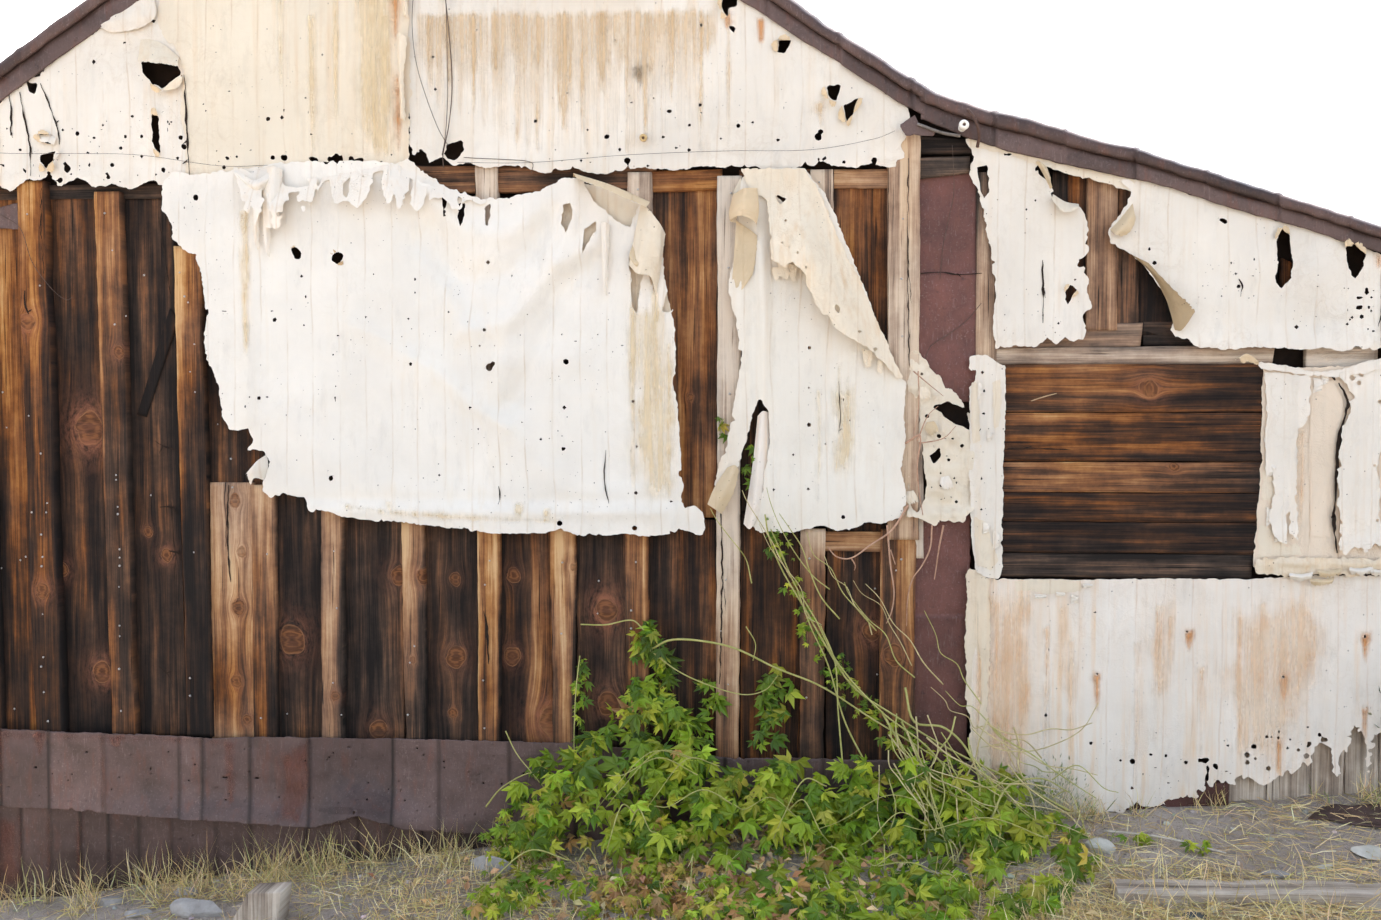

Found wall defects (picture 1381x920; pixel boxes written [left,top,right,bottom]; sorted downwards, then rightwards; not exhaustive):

peeling [150,75,182,116]
peeling [1345,239,1367,254]
peeling [970,379,1002,443]
peeling [1257,369,1381,558]
peeling [974,517,1001,571]